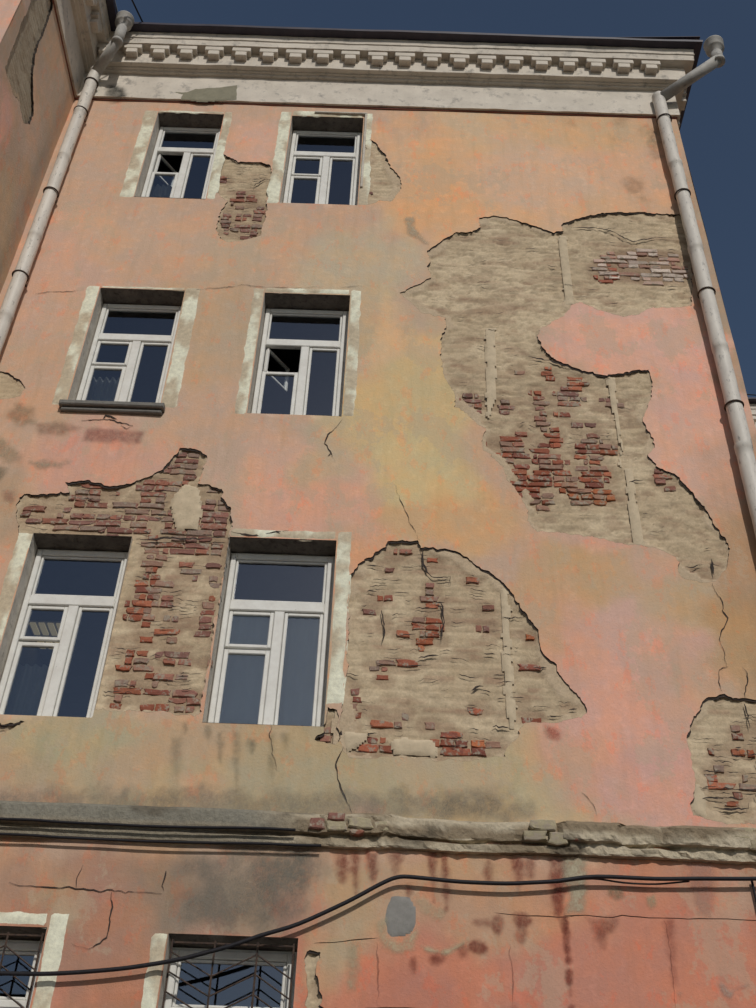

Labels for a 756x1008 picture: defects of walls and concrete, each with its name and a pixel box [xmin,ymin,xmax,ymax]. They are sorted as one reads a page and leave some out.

spalling [5,0,53,124]
spalling [216,154,272,242]
spalling [367,140,402,205]
spalling [400,212,730,583]
spalling [16,448,233,718]
spalling [315,540,587,762]
crack [712,583,748,694]
crack [335,749,352,812]
spalling [687,694,756,824]
crack [9,865,166,949]
damp [564,857,586,911]
spalling [304,942,328,1008]